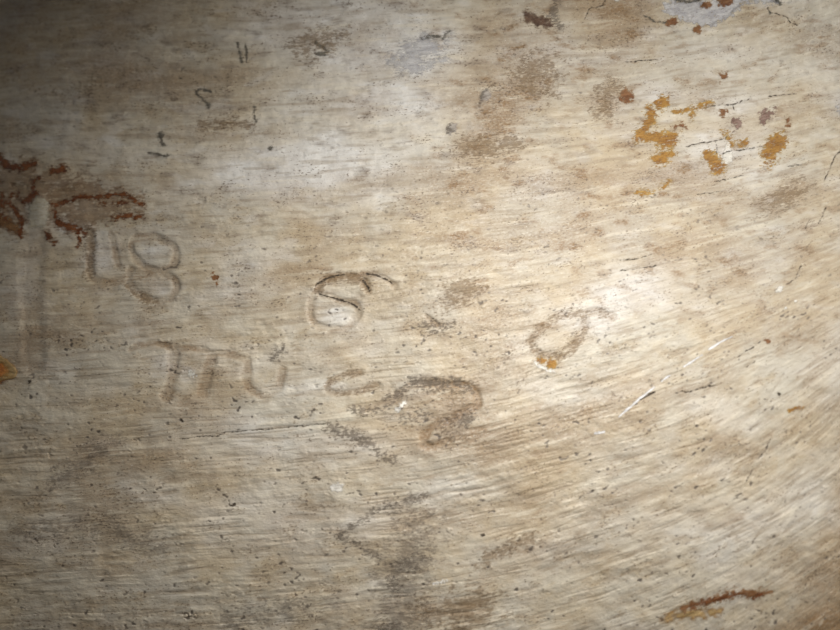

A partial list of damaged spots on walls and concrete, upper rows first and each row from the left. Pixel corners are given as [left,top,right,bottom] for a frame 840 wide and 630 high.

spalling [644,0,782,34]
corrosion [619,86,634,104]
corrosion [632,94,749,168]
corrosion [758,106,777,127]
corrosion [758,118,791,170]
corrosion [0,152,37,172]
corrosion [700,149,728,175]
corrosion [0,163,69,239]
corrosion [634,179,672,197]
corrosion [44,192,146,248]
corrosion [0,355,18,384]
corrosion [664,586,773,623]